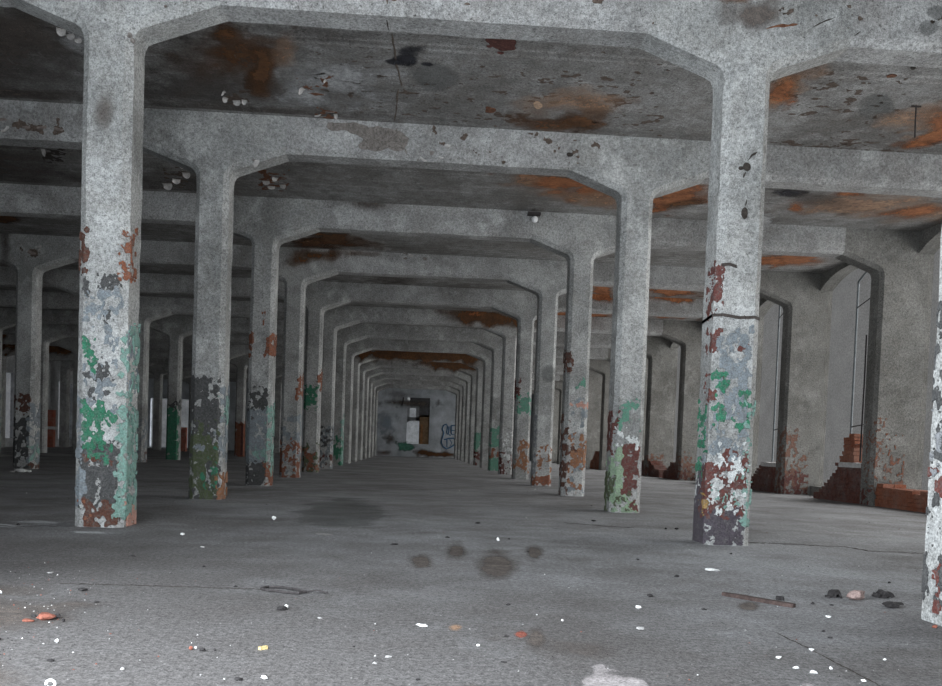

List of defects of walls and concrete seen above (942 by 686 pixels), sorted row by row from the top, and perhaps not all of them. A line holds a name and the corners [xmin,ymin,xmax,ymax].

crack [386,0,402,121]
rust [517,97,609,132]
rust [769,77,799,106]
rust [517,174,612,204]
rust [790,192,942,218]
rust [450,311,517,328]
peeling [75,226,148,527]
peeling [166,369,344,500]
peeling [604,398,664,513]
peeling [675,260,756,554]
peeling [921,544,942,614]
crack [778,633,880,686]